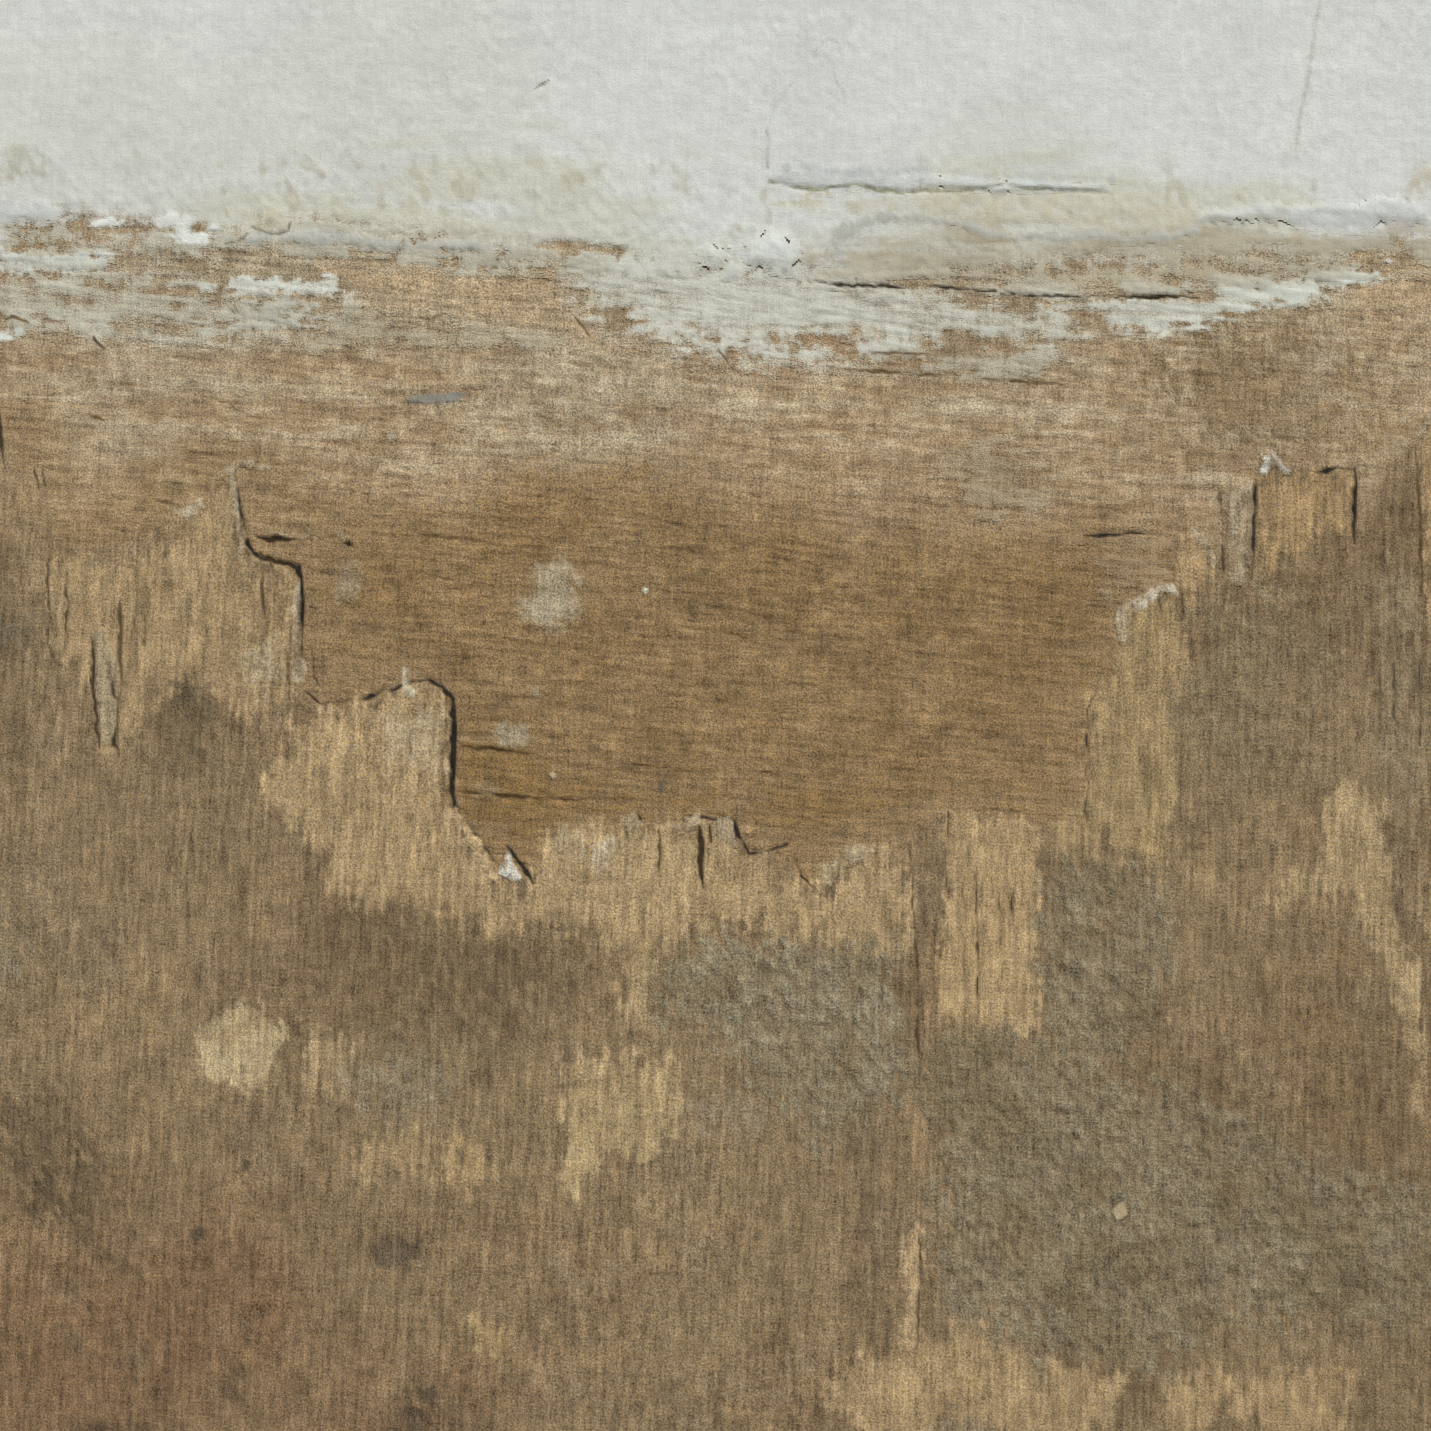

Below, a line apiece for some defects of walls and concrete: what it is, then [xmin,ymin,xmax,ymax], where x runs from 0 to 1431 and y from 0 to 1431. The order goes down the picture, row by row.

crack [763,36,1114,197]
peeling [0,195,1431,889]